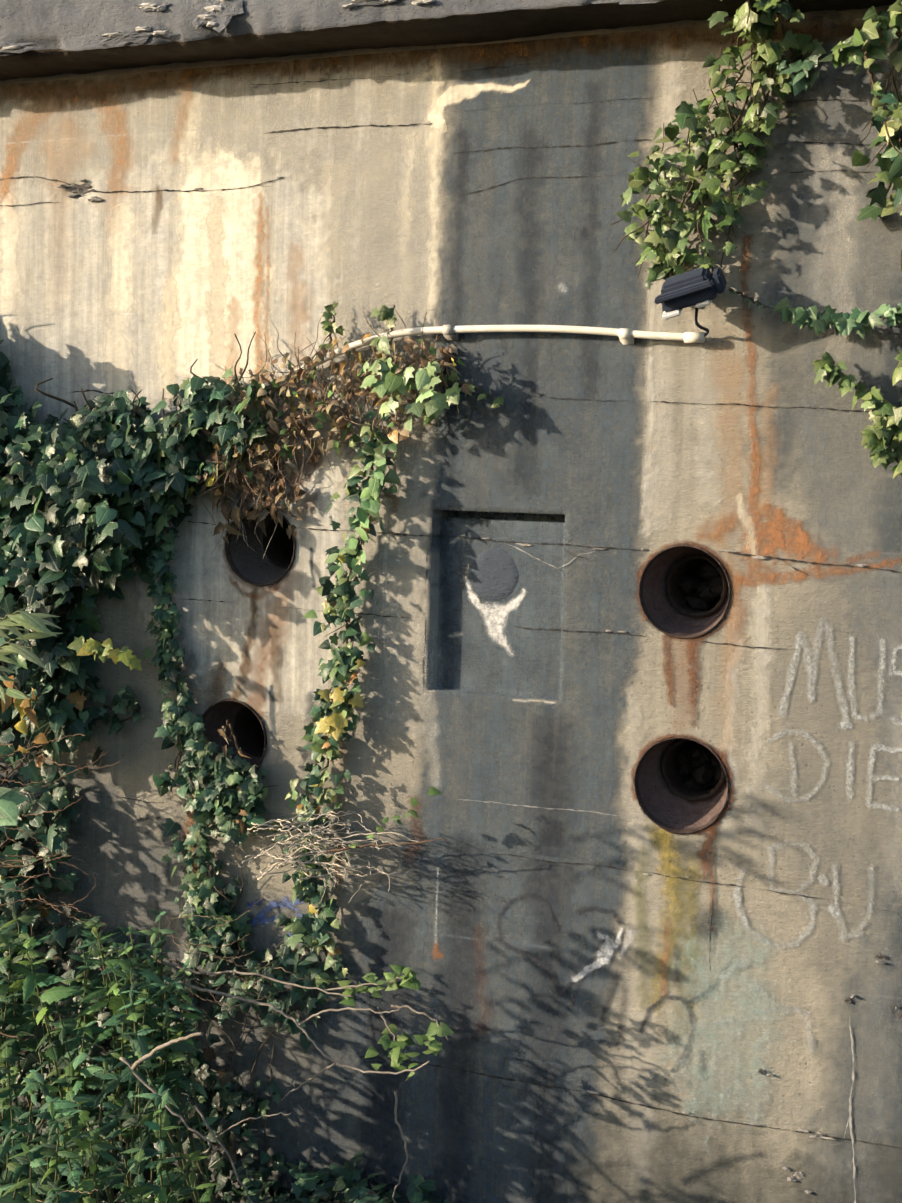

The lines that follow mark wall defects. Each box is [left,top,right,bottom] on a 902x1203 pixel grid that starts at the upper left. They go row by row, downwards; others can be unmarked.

spalling [0,42,37,53]
spalling [96,2,169,47]
spalling [189,0,244,32]
corrosion [0,25,860,182]
crack [264,98,651,134]
crack [0,176,283,207]
corrosion [636,308,898,621]
corrosion [231,581,281,702]
damp [20,31,744,1203]
damp [774,14,902,1203]
damp [6,990,74,1137]
crack [355,1019,902,1203]